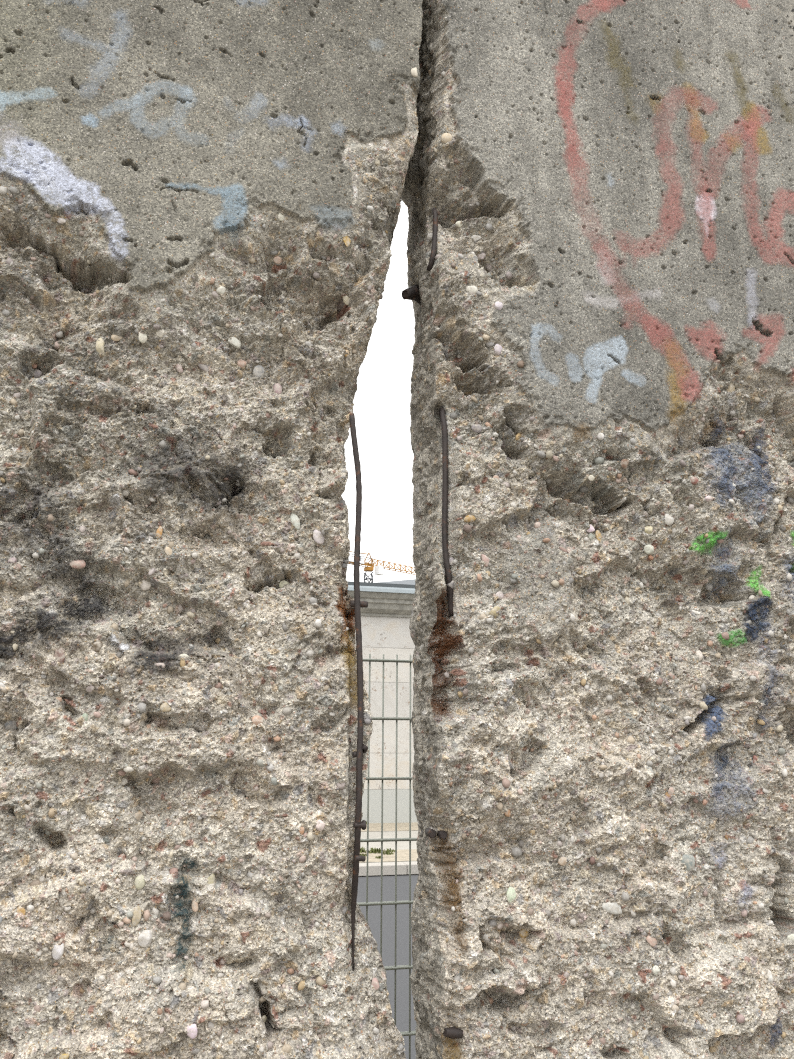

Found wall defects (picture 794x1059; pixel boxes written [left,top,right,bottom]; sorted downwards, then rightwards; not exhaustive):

spalling [0,67,419,1059]
spalling [424,7,794,1059]
corrosion [338,587,357,700]
corrosion [427,589,460,715]
corrosion [433,841,465,949]